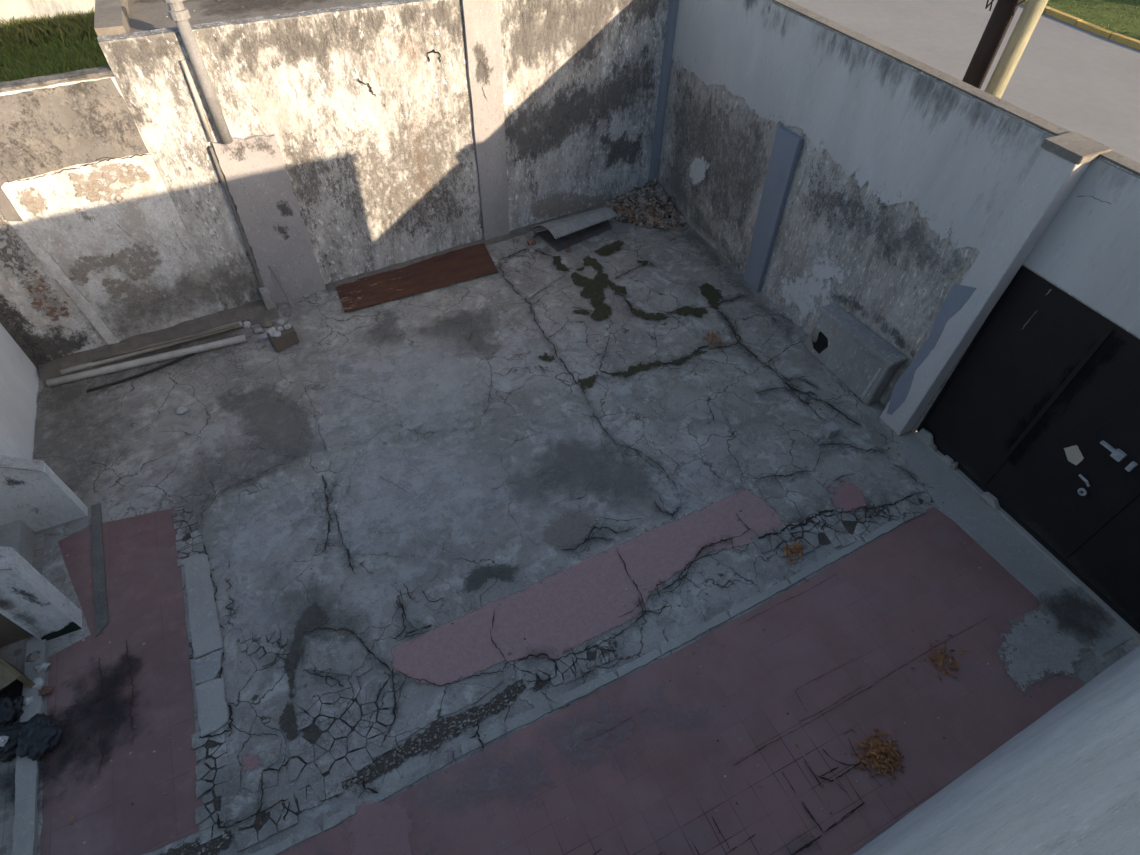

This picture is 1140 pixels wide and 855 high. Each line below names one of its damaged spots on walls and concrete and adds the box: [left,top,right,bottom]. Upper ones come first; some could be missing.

damp [109,36,178,131]
damp [205,0,462,74]
damp [475,0,664,167]
peeling [69,162,153,222]
damp [232,93,477,240]
flaking render [0,215,70,322]
peeling [66,240,166,304]
crack [209,386,397,575]
crack [303,249,933,745]
crack [189,546,290,828]
spalling [522,636,617,691]
crack [732,619,985,855]